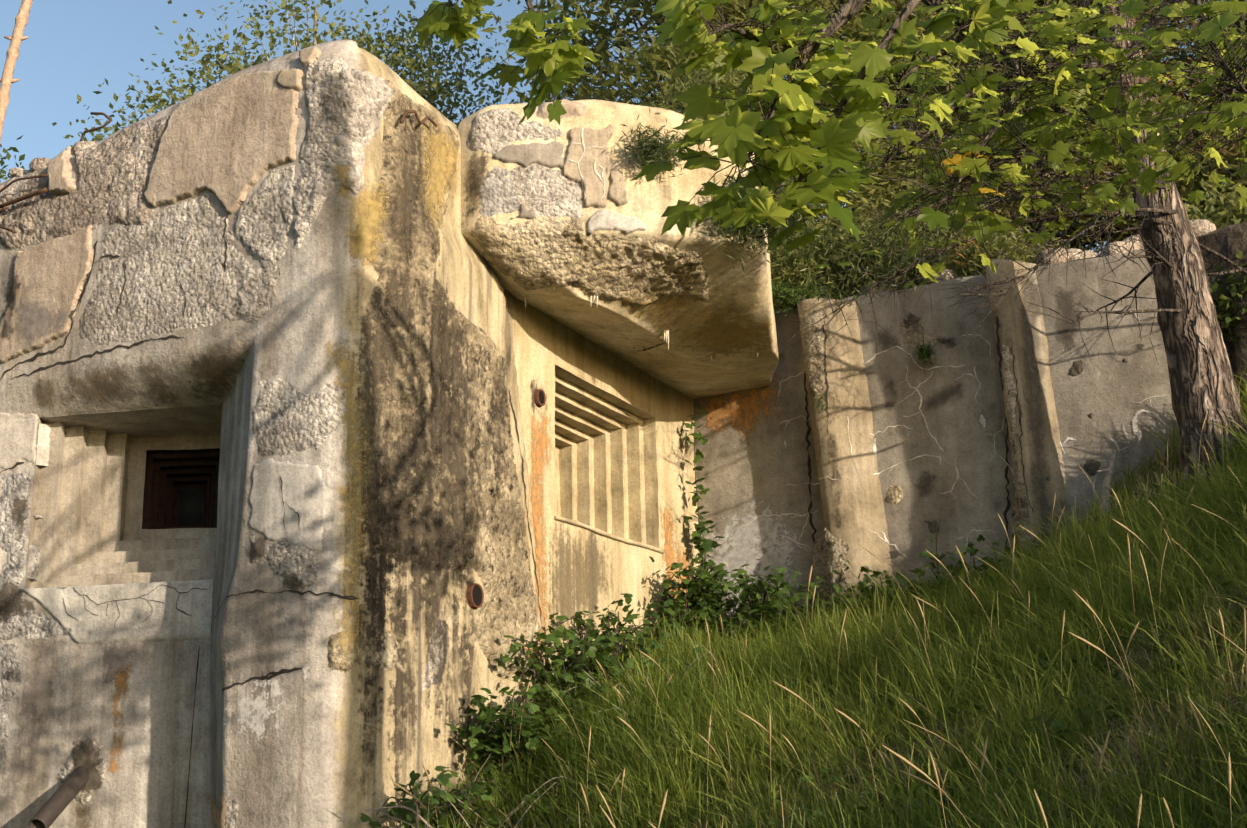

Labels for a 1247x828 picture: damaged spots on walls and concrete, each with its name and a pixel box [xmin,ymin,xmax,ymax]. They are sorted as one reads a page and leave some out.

spalling [0,412,72,769]
corrosion [109,666,130,772]
crack [57,584,358,628]
crack [221,668,302,695]
spalling [0,46,710,678]
water stain [327,94,511,805]
corrosion [521,415,552,676]
crack [742,316,1033,549]
crack [870,530,906,556]